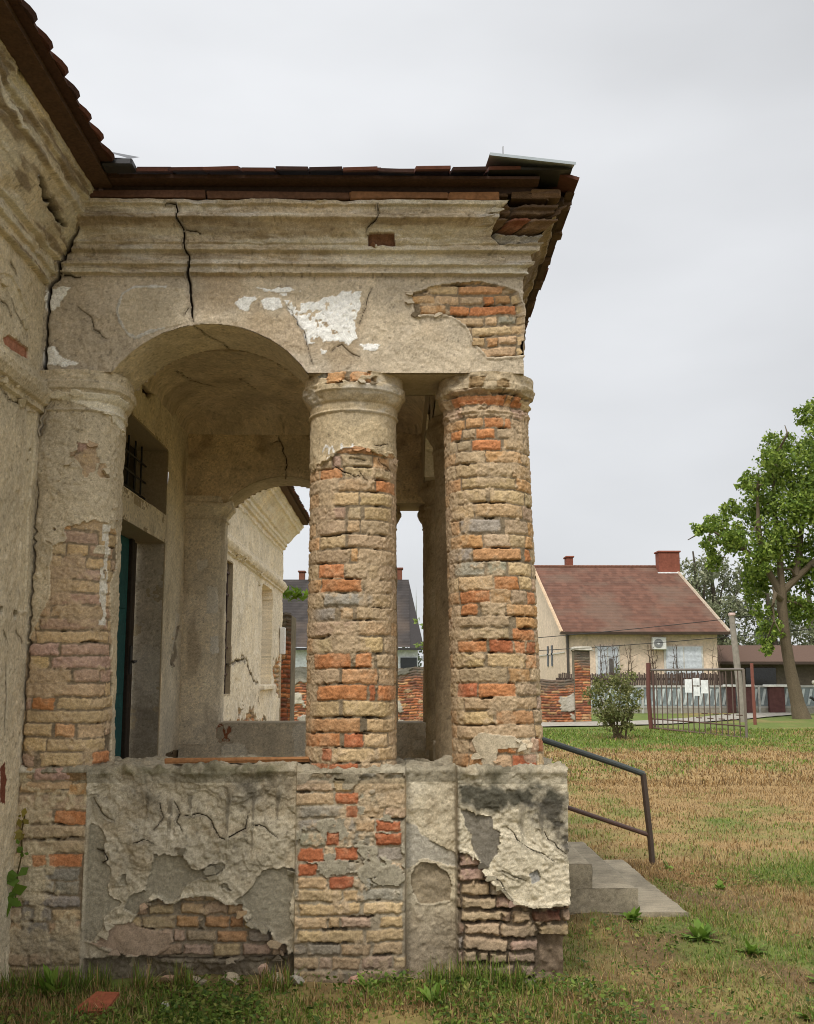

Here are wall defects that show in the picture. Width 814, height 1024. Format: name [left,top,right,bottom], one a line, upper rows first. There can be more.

crack [365,203,381,238]
spalling [473,203,567,245]
crack [0,174,107,370]
crack [164,200,229,349]
peeling [235,287,381,354]
spalling [405,281,525,358]
spalling [438,376,544,768]
spalling [8,501,119,986]
crack [226,654,266,721]
spalling [132,442,570,985]
crack [92,797,115,823]
crack [133,801,277,846]